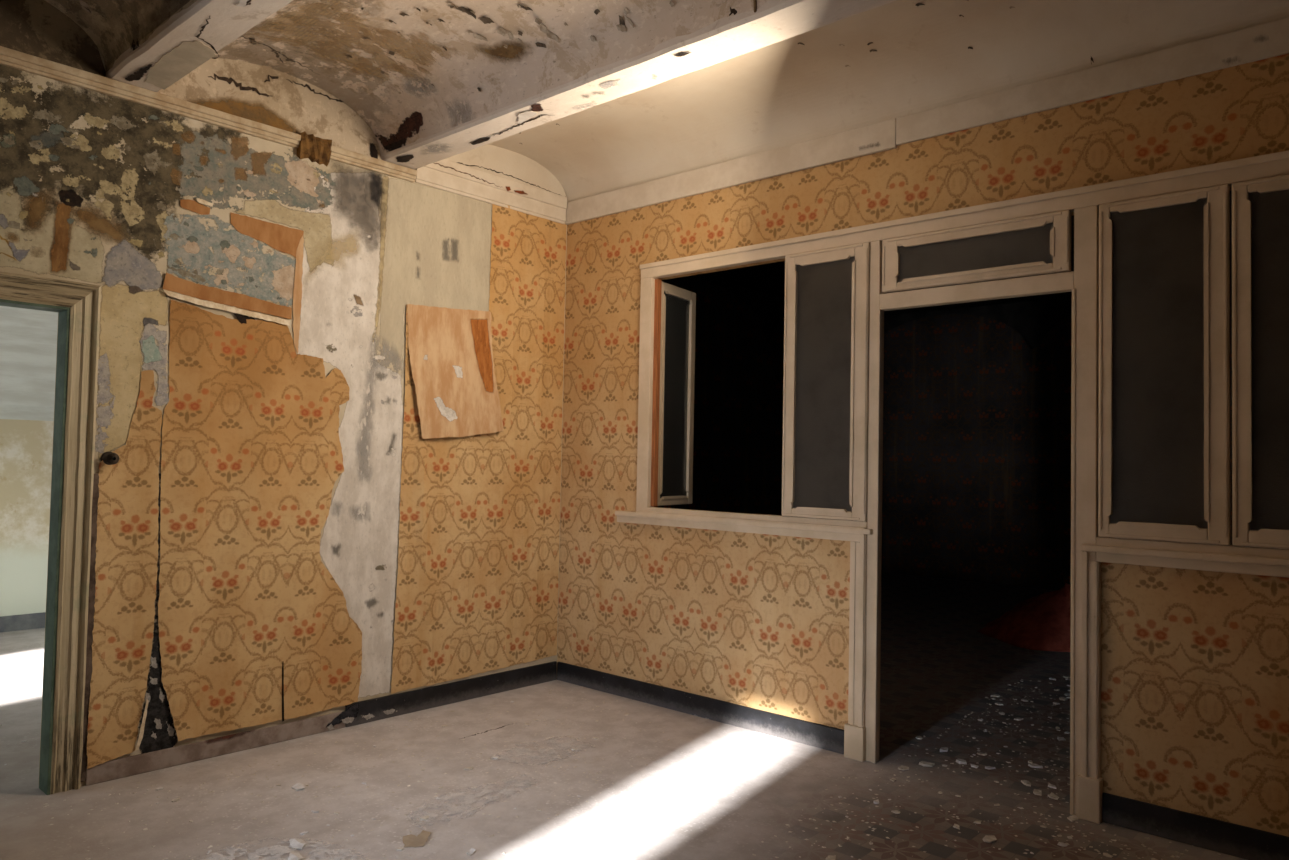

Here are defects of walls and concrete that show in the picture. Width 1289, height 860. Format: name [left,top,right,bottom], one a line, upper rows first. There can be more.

peeling [389,2,568,48]
peeling [616,8,634,32]
spalling [125,64,152,81]
crack [195,16,343,102]
spalling [584,79,621,98]
spalling [470,104,559,145]
damp [0,65,297,261]
flaking render [0,74,492,730]